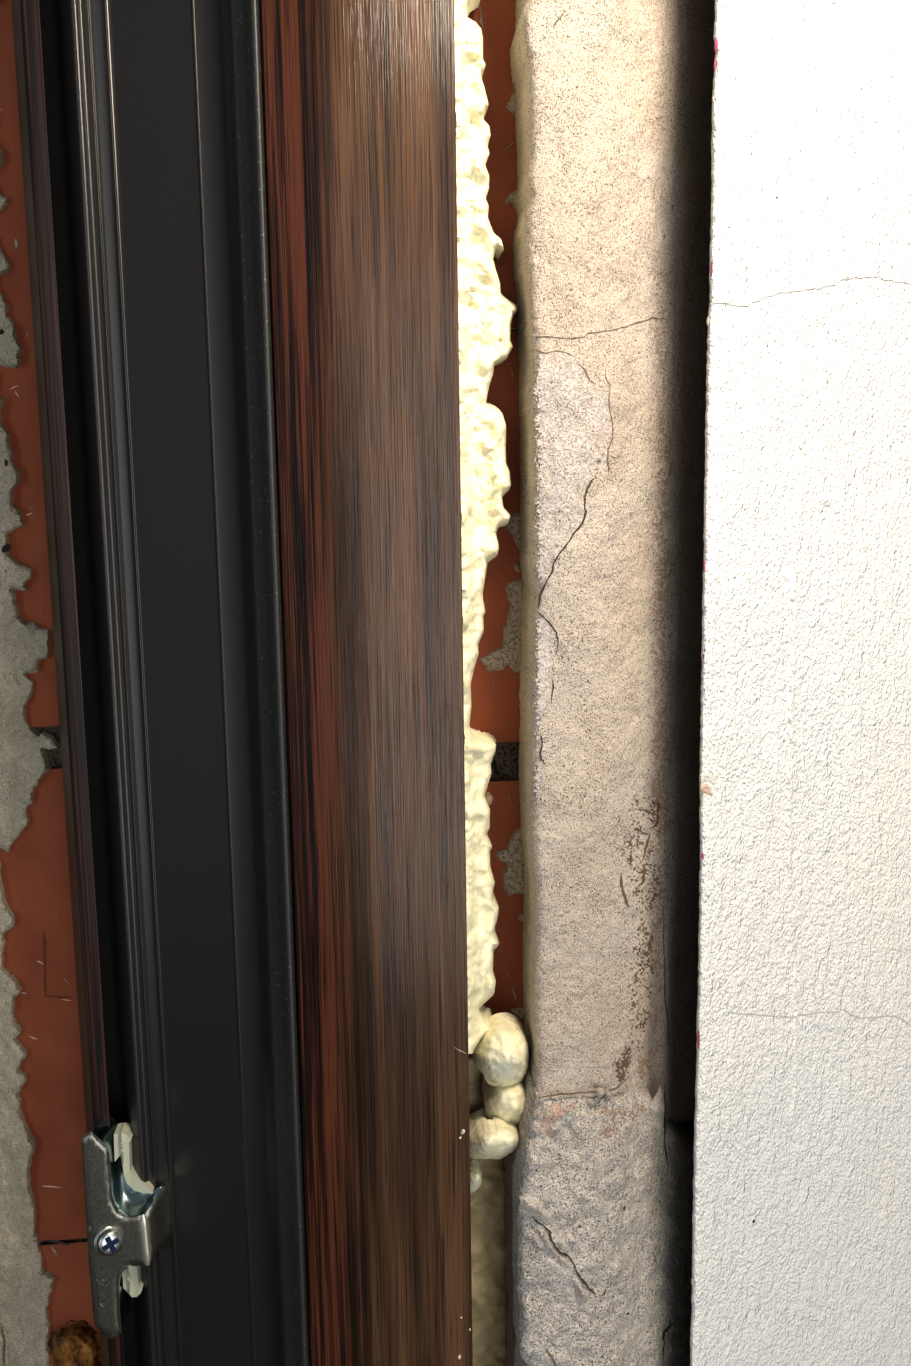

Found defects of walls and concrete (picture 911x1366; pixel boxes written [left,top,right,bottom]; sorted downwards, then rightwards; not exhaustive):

crack [725,276,909,307]
peeling [533,352,612,591]
crack [534,317,667,762]
crack [727,1009,911,1026]
crack [532,1217,606,1295]